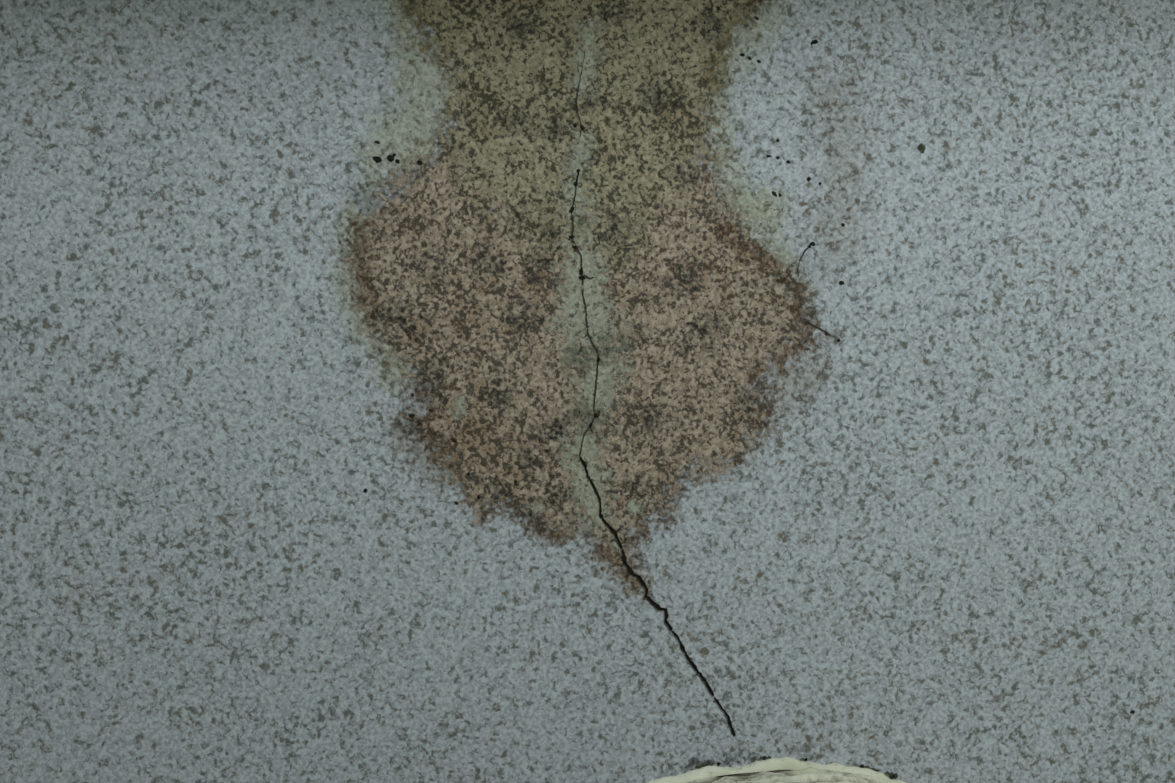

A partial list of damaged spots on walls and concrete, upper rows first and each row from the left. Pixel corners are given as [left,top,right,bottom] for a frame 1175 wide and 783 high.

leakage [332,0,840,600]
crack [569,52,736,736]
crack [695,761,721,769]
crack [859,764,898,779]